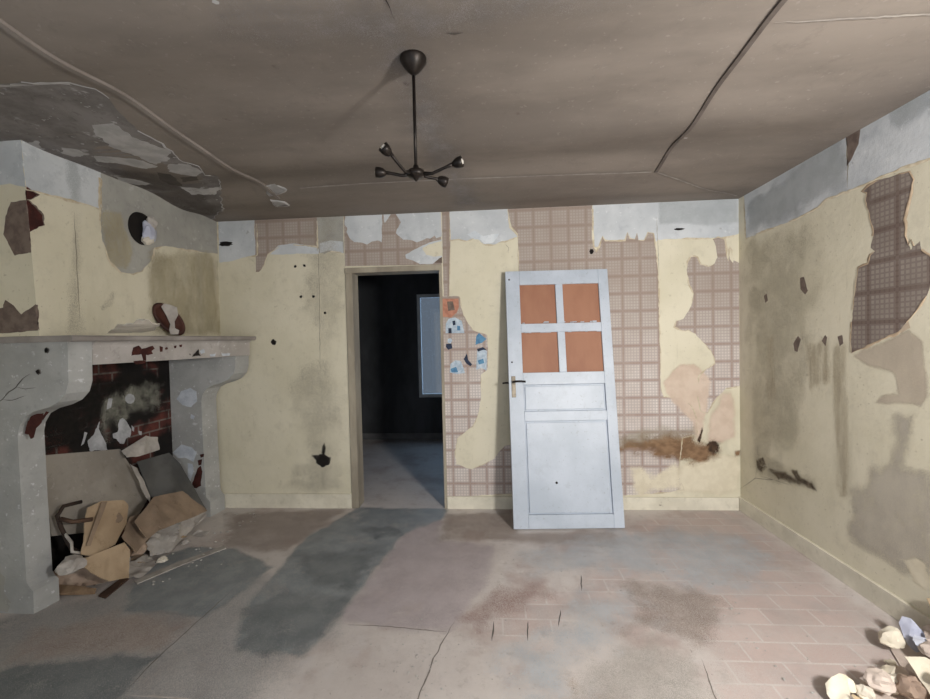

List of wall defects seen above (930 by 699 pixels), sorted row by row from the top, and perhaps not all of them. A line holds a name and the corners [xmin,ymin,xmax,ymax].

peeling [0,82,258,275]
peeling [266,184,290,207]
flaking render [589,90,930,254]
flaking render [270,209,517,268]
spalling [0,300,39,333]
flaking render [677,452,740,496]
crack [362,624,453,699]